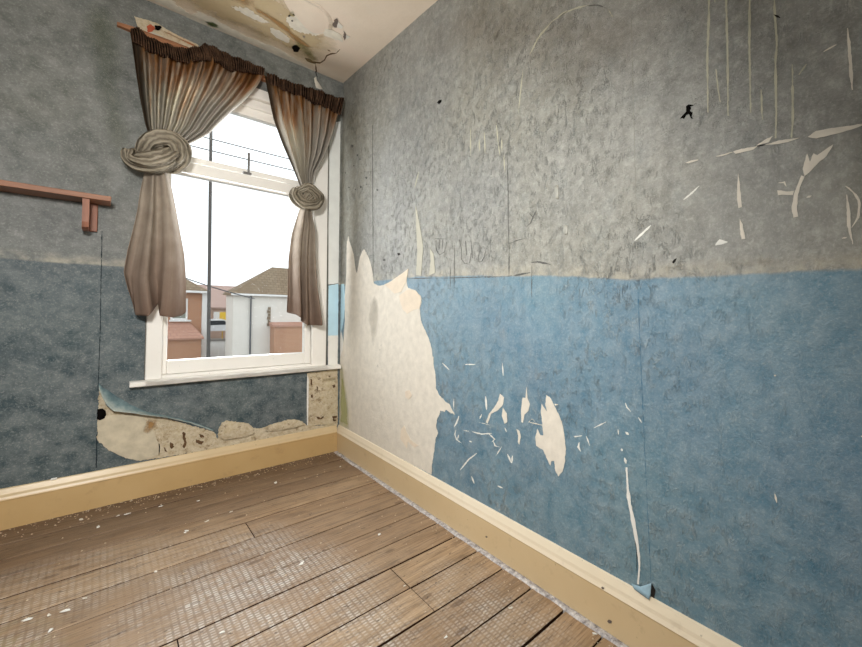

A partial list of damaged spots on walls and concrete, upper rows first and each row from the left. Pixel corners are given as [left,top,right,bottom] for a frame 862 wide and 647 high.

flaking render [134,16,198,48]
peeling [154,0,350,71]
flaking render [96,369,338,461]